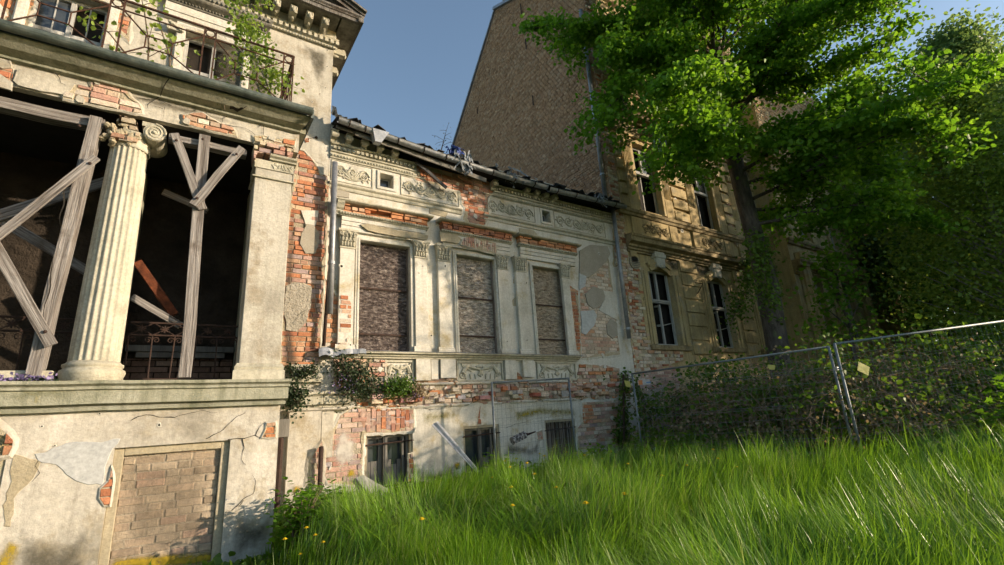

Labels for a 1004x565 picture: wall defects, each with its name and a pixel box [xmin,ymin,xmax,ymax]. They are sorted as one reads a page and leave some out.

spalling [0,0,16,20]
spalling [25,0,39,27]
spalling [0,58,145,147]
spalling [180,112,238,138]
spalling [251,134,684,489]
spalling [0,418,20,461]
crack [132,410,265,510]
spalling [97,465,116,508]